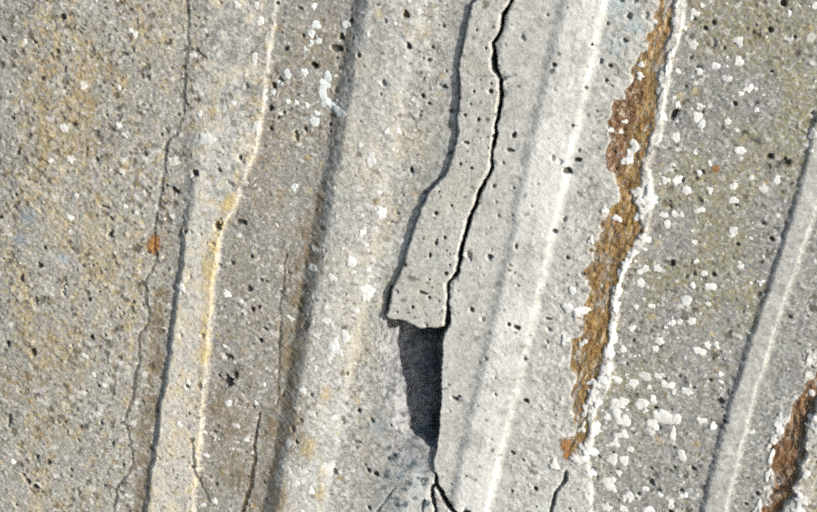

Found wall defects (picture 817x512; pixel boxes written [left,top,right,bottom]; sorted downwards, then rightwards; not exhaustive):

crack [445,1,513,329]
corrosion [561,0,673,460]
spalling [379,285,450,478]
crack [431,473,470,512]
crack [550,471,567,512]
corrosion [762,374,817,512]